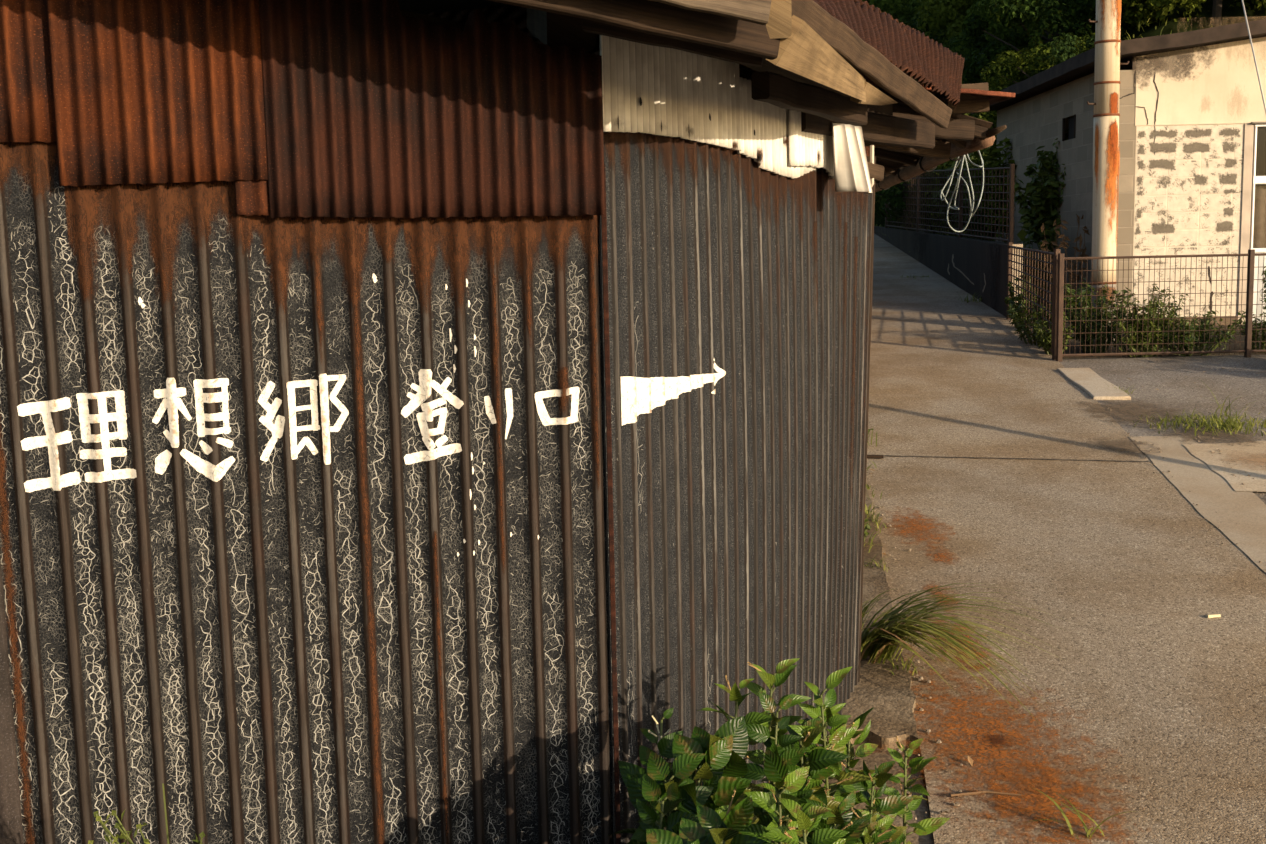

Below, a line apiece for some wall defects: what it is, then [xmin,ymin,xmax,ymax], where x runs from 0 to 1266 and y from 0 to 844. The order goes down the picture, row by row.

corrosion [1100,0,1121,55]
leakage [1132,45,1210,86]
crack [1119,71,1159,155]
corrosion [1094,92,1120,245]
peeling [1135,128,1240,265]